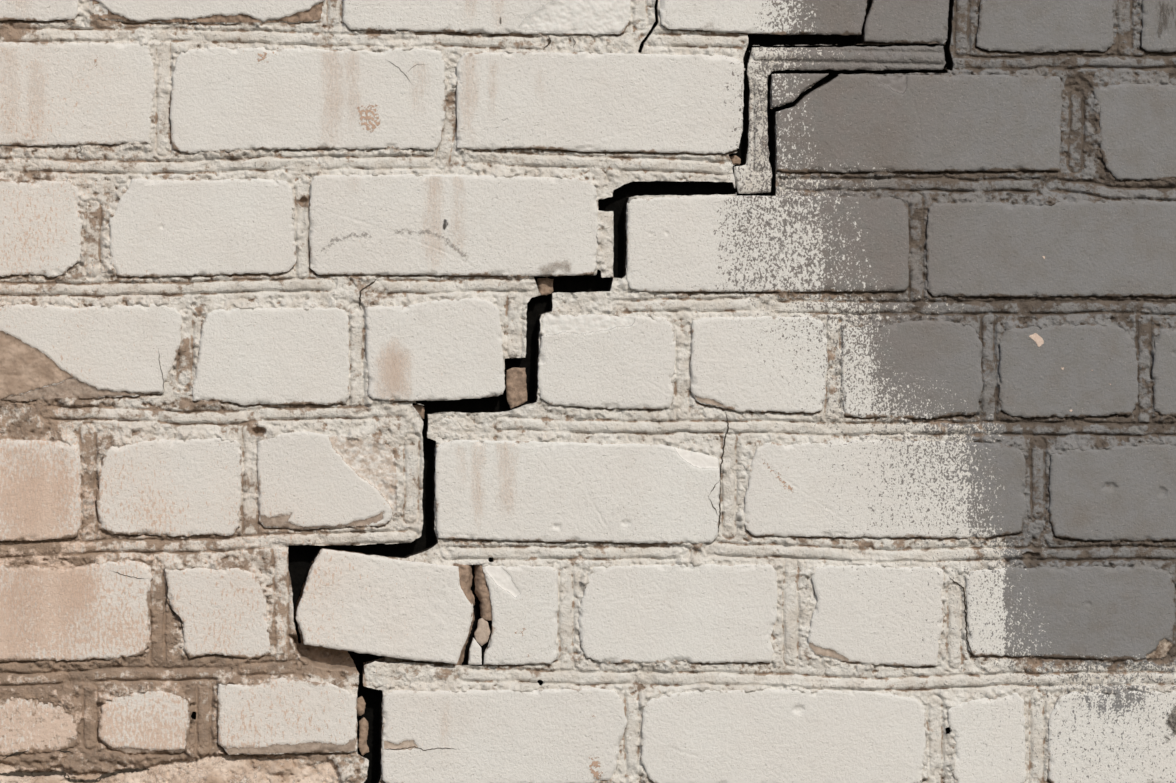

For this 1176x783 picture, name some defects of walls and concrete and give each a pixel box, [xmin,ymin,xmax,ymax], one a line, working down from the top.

spalling [0,331,160,401]
crack [288,0,951,643]
spalling [261,435,398,529]
crack [462,565,490,665]
spalling [0,738,355,783]
crack [348,651,454,783]